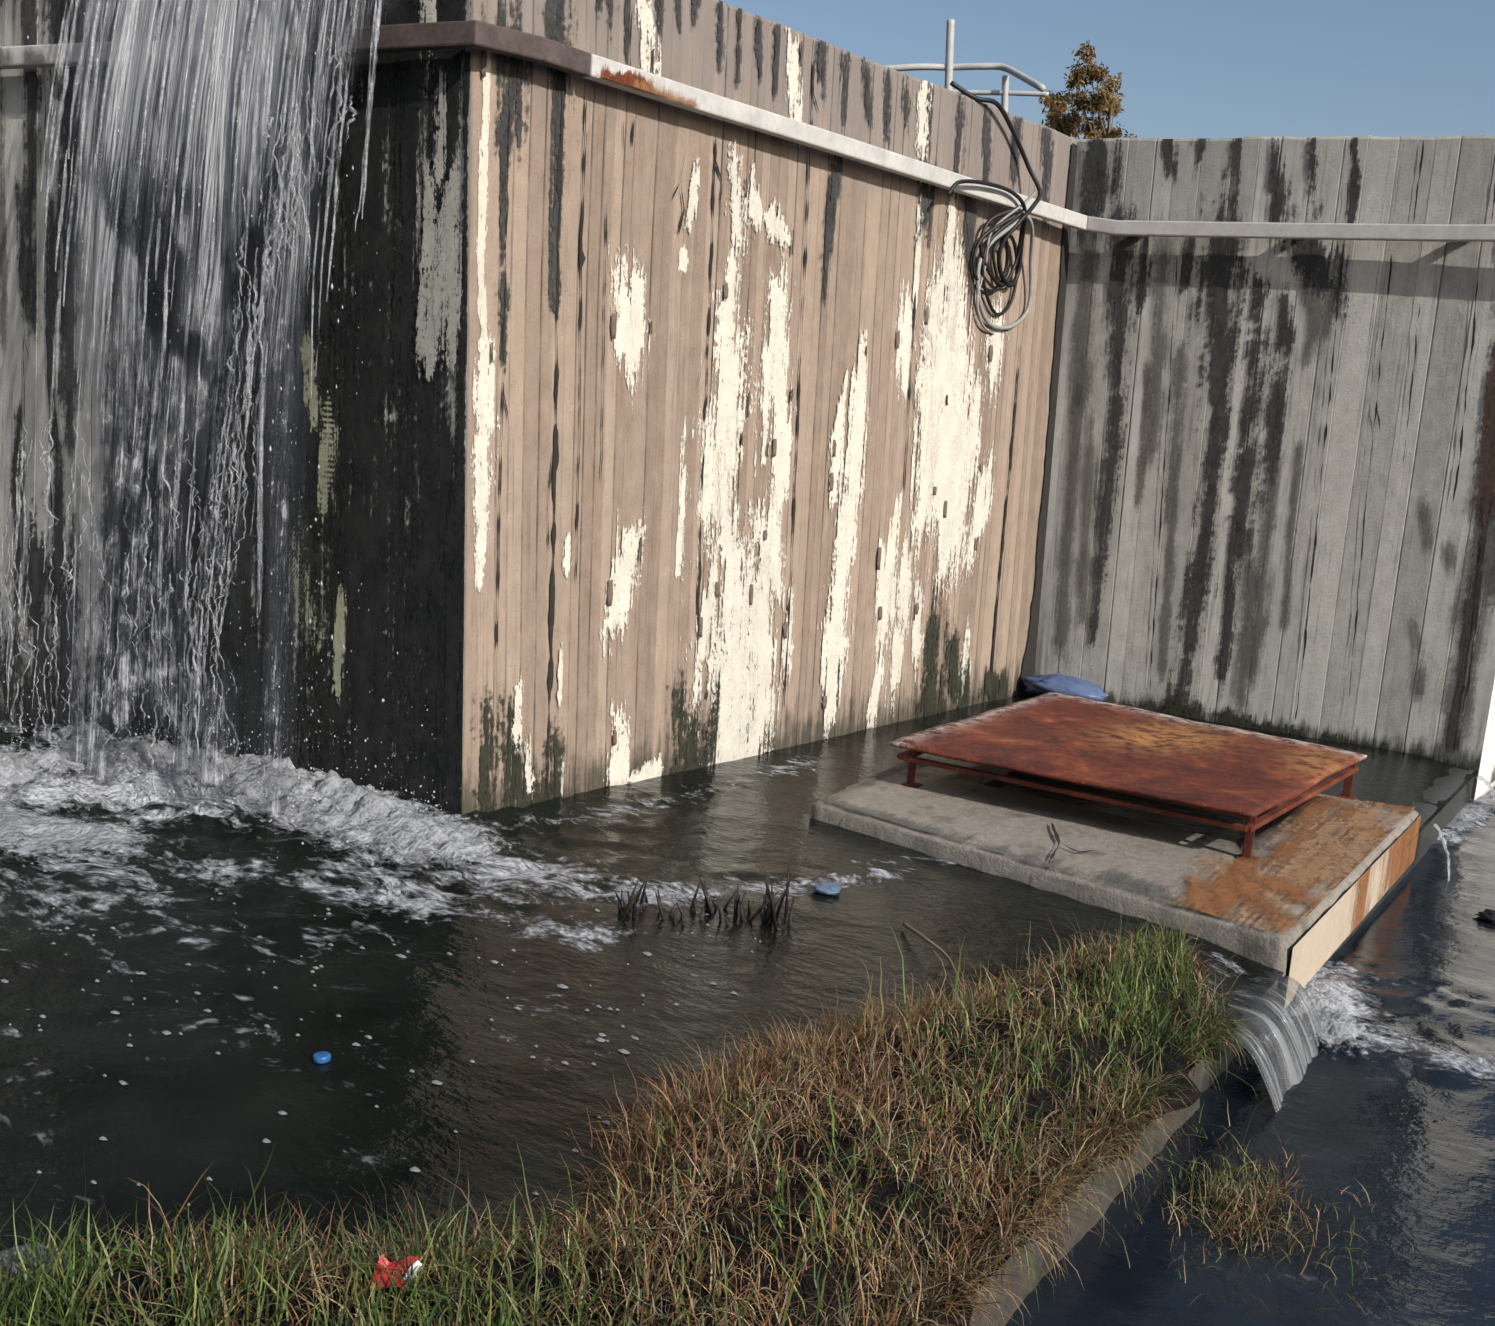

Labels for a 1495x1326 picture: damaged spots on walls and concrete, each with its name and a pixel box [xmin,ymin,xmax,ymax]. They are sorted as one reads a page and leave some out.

leakage [1,0,87,46]
leakage [0,49,470,814]
peeling [415,50,504,592]
peeling [599,507,648,668]
peeling [607,240,655,408]
peeling [603,700,667,786]
peeling [671,139,797,766]
peeling [817,327,874,739]
peeling [866,181,1011,729]
leakage [1054,137,1389,750]
corrosion [1174,795,1421,935]
corrosion [1472,343,1495,546]